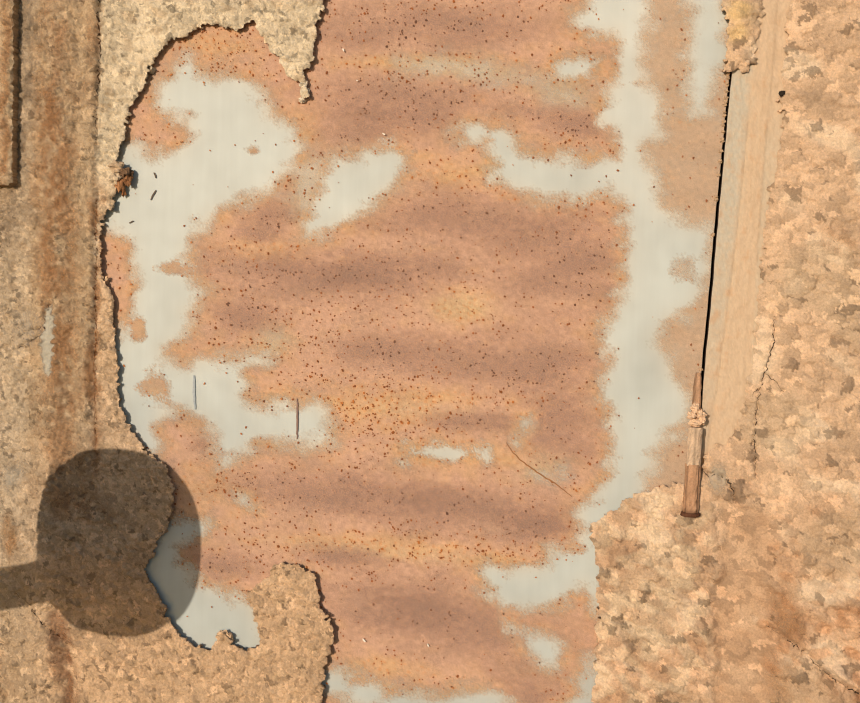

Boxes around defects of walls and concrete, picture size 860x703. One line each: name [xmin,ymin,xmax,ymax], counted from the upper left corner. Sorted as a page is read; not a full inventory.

rust [640,0,729,223]
rust [99,233,146,342]
spalling [99,23,216,650]
rust [124,0,634,703]
rust [647,425,689,493]
rust [662,281,710,392]
crack [751,317,784,478]
spalling [216,630,261,651]
spalling [276,561,335,696]
crack [768,626,859,694]